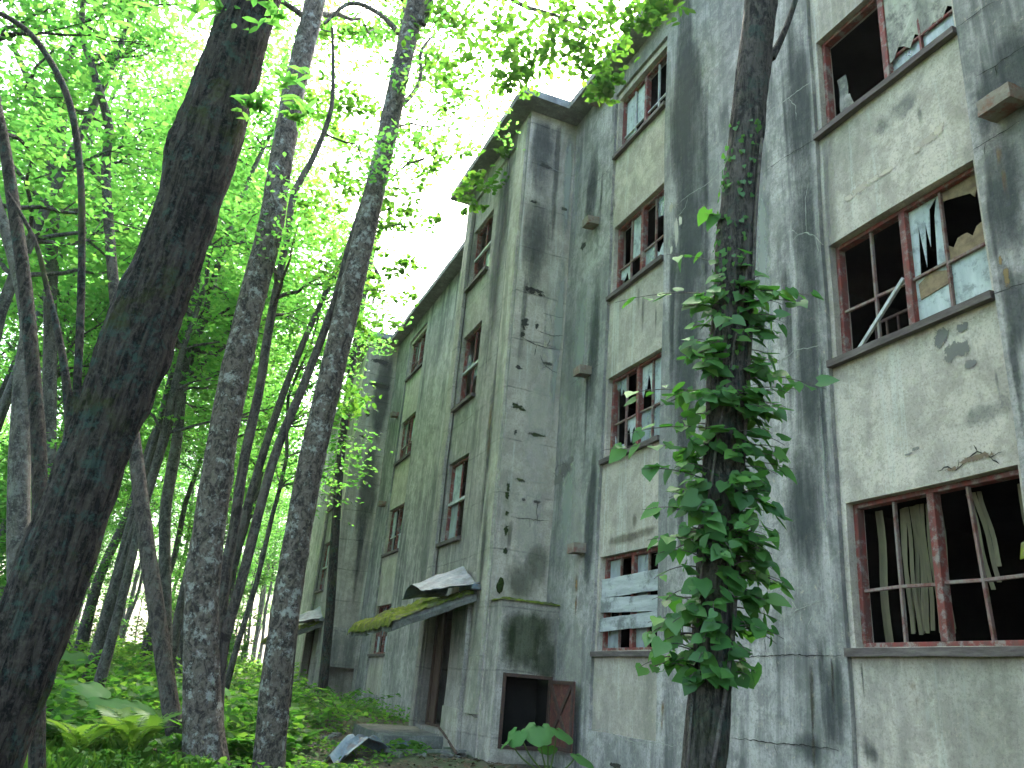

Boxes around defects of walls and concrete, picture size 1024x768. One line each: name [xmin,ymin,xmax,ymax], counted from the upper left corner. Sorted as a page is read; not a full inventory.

leakage [789,41,810,160]
leakage [528,125,572,276]
leakage [783,179,826,473]
peeling [934,322,976,369]
crack [939,446,1001,471]
leakage [791,460,826,556]
leakage [800,661,842,758]